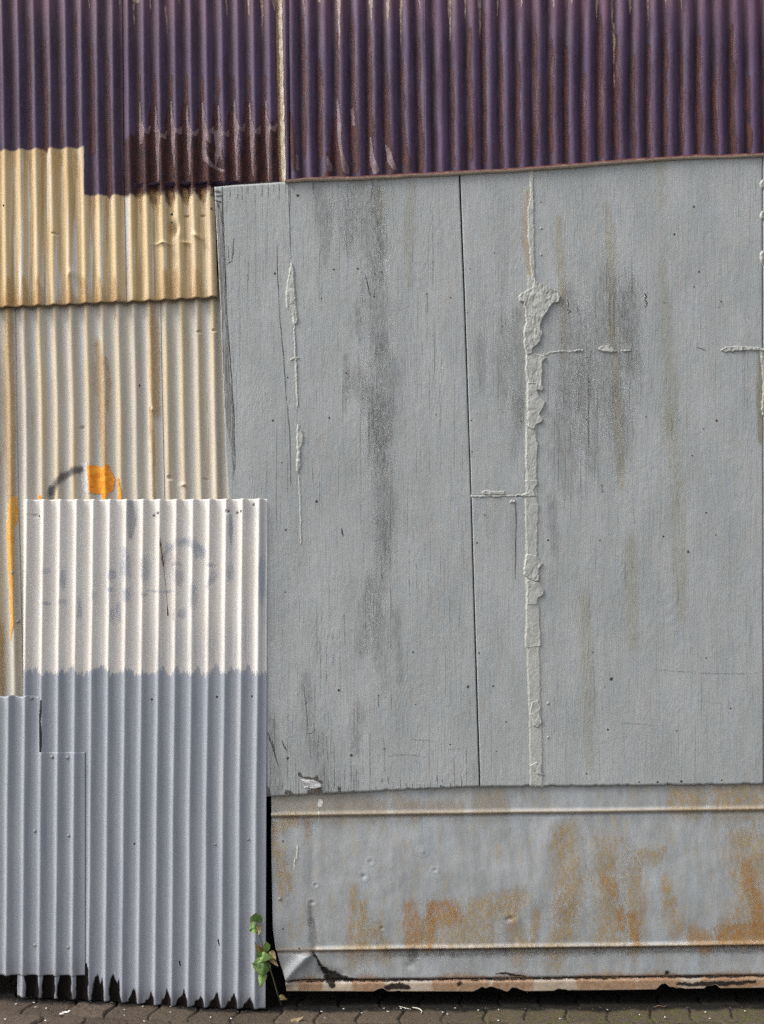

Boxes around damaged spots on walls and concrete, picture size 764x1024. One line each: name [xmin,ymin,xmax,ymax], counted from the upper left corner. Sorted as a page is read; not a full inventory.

corrosion [28,12,424,213]
corrosion [466,13,504,167]
corrosion [516,15,764,165]
peeling [471,171,631,787]
corrosion [353,978,384,991]
corrosion [405,892,539,955]
corrosion [433,975,532,991]
corrosion [576,974,678,990]
corrosion [663,833,764,953]
corrosion [701,972,764,988]